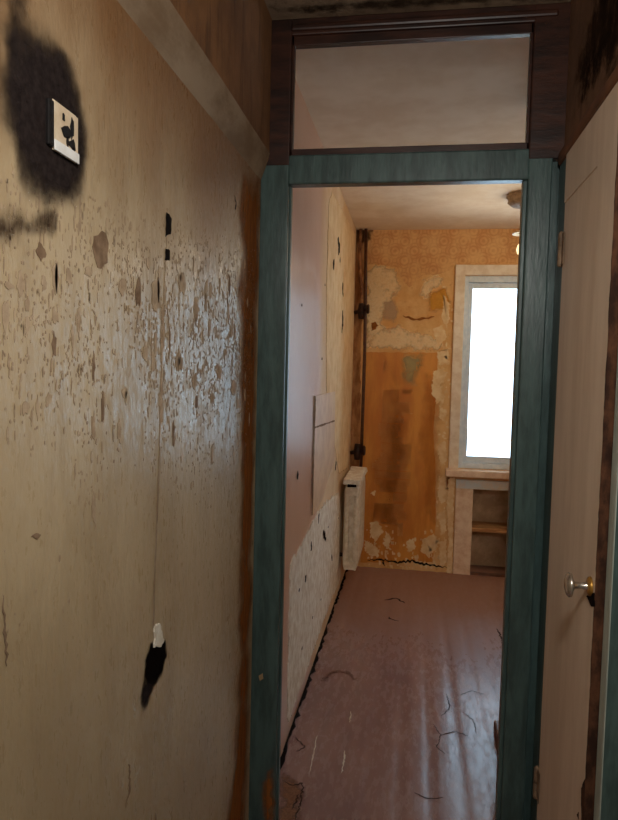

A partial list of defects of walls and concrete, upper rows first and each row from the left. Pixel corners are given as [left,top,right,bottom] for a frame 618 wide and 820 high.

peeling [0,170,255,530]
spalling [141,623,167,709]
crack [368,558,446,568]
peeling [364,266,455,574]